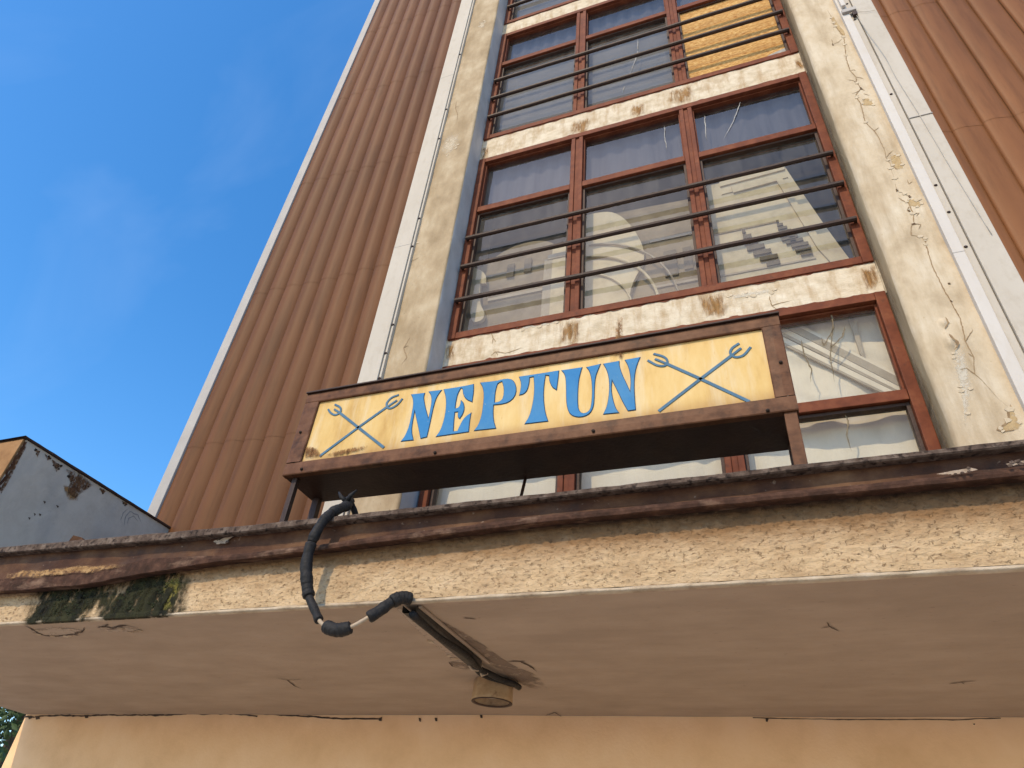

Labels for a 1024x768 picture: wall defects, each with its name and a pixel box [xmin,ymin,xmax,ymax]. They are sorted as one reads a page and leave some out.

crack [828,11,1006,405]
rust [863,267,877,288]
rust [702,297,724,315]
rust [563,323,578,343]
peeling [997,404,1022,433]
crack [26,624,135,637]